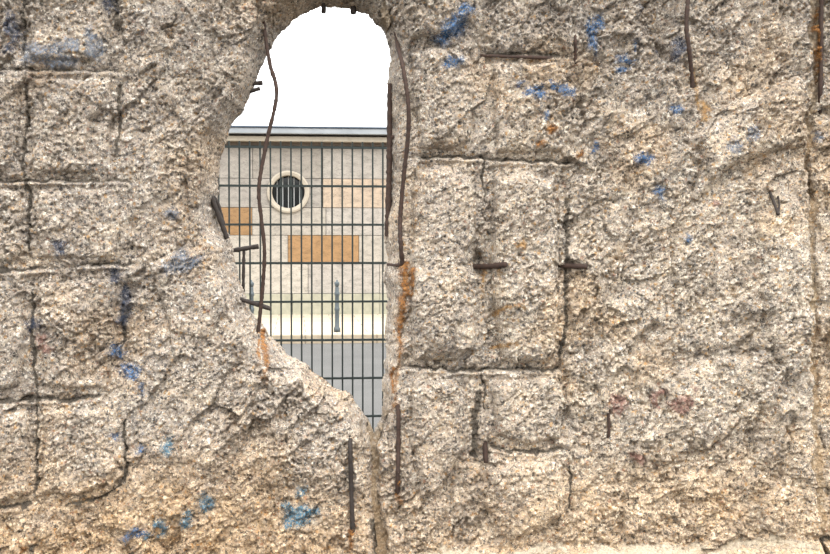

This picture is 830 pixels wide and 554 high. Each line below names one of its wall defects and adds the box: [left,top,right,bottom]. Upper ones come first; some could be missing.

spalling [252,0,276,24]
rust [811,8,823,82]
crack [0,0,135,274]
crack [119,289,127,355]
rust [389,261,415,407]
crack [0,291,102,510]
crack [65,421,129,506]
crack [819,536,830,554]